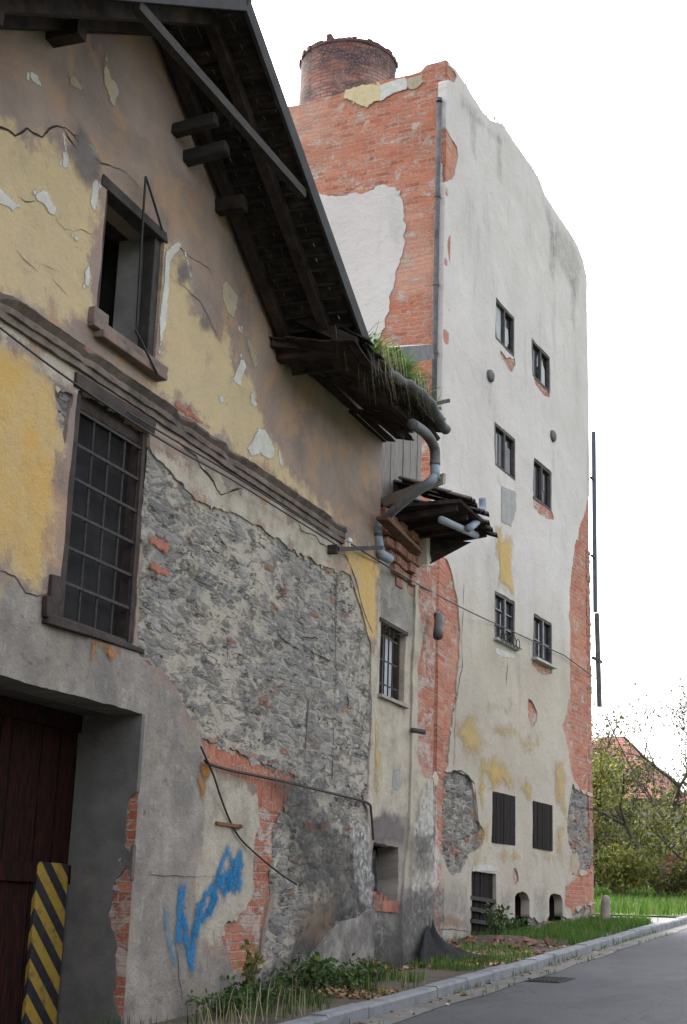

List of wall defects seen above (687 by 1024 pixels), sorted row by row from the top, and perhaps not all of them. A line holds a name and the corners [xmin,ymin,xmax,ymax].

peeling [33,190,56,215]
crack [0,125,137,184]
peeling [90,180,102,211]
spalling [288,60,457,347]
peeling [158,233,192,354]
peeling [247,428,283,470]
spalling [421,438,430,481]
crack [2,571,45,597]
spalling [134,446,371,982]
spalling [417,557,497,934]
spalling [561,500,594,922]
spalling [109,791,139,1023]